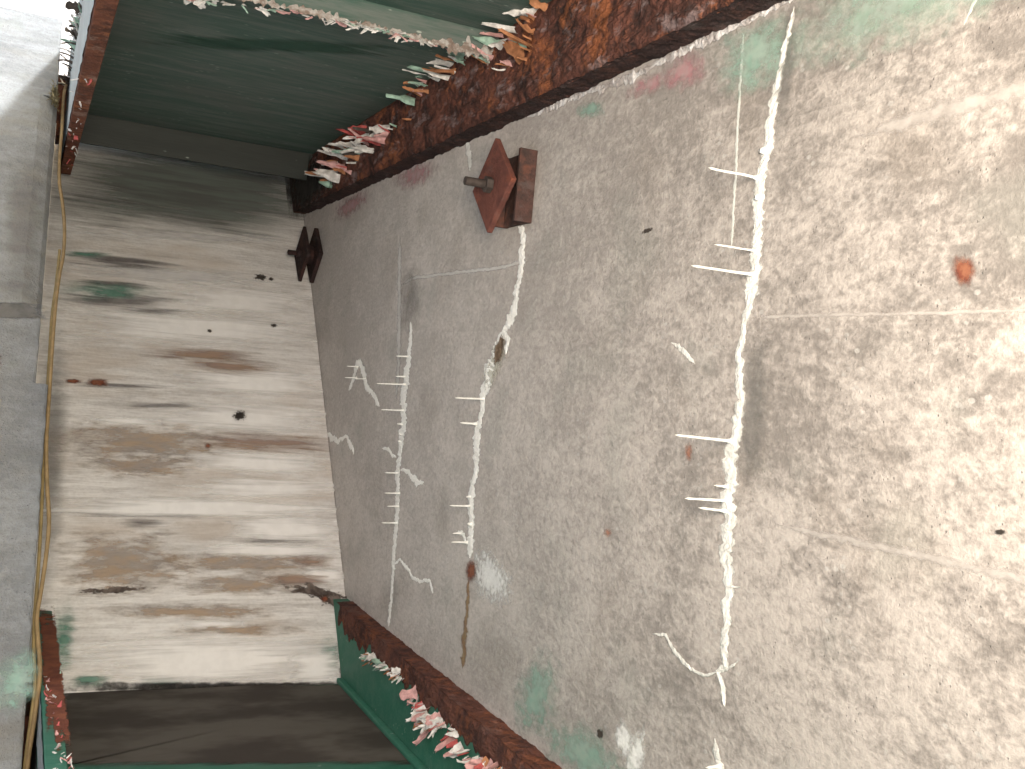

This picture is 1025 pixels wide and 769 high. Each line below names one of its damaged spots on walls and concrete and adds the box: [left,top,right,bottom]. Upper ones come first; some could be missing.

rust [61,0,119,174]
peeling [305,118,411,188]
peeling [184,0,548,106]
rust [297,0,789,213]
damp [64,453,337,556]
damp [100,370,322,430]
crack [345,322,433,627]
crack [450,225,526,558]
crack [654,7,795,707]
damp [81,622,341,691]
peeling [358,651,503,769]
rust [337,601,562,769]